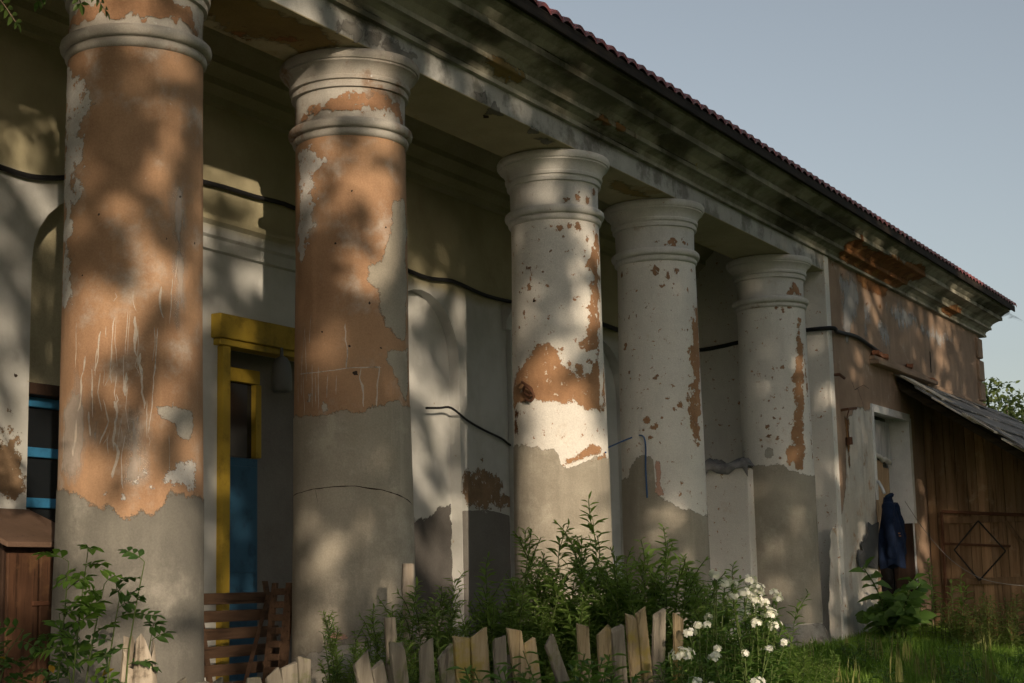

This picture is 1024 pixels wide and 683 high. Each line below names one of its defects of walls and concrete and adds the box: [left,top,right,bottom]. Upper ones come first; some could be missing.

damp [208,0,338,54]
damp [340,0,381,27]
damp [405,15,526,84]
damp [618,82,689,160]
peeling [62,65,96,309]
peeling [297,144,328,263]
peeling [513,221,606,413]
peeling [752,282,813,470]
peeling [0,425,27,501]
crack [295,486,411,503]
spalling [461,458,510,512]
peeling [563,443,606,466]